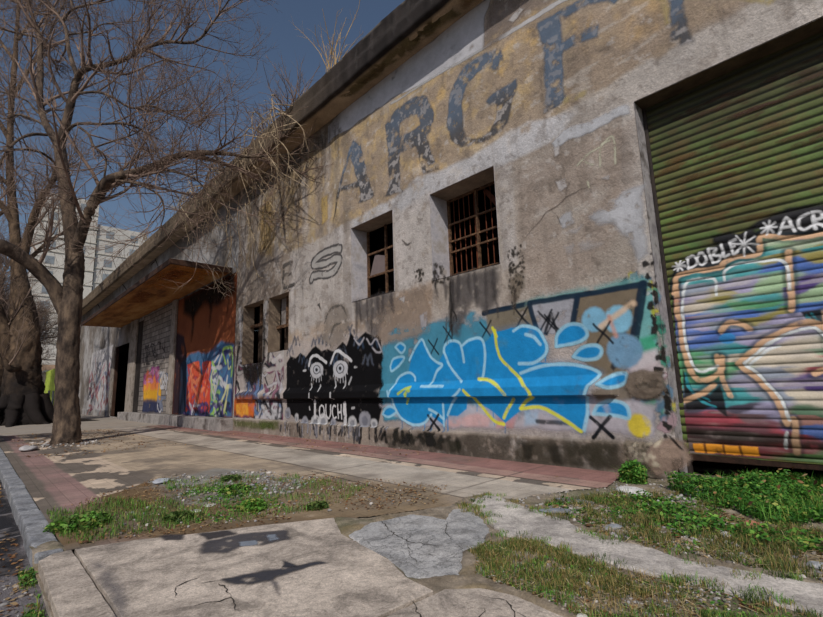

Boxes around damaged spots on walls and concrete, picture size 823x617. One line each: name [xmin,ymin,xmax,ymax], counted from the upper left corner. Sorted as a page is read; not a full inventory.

leakage [515,441,621,469]